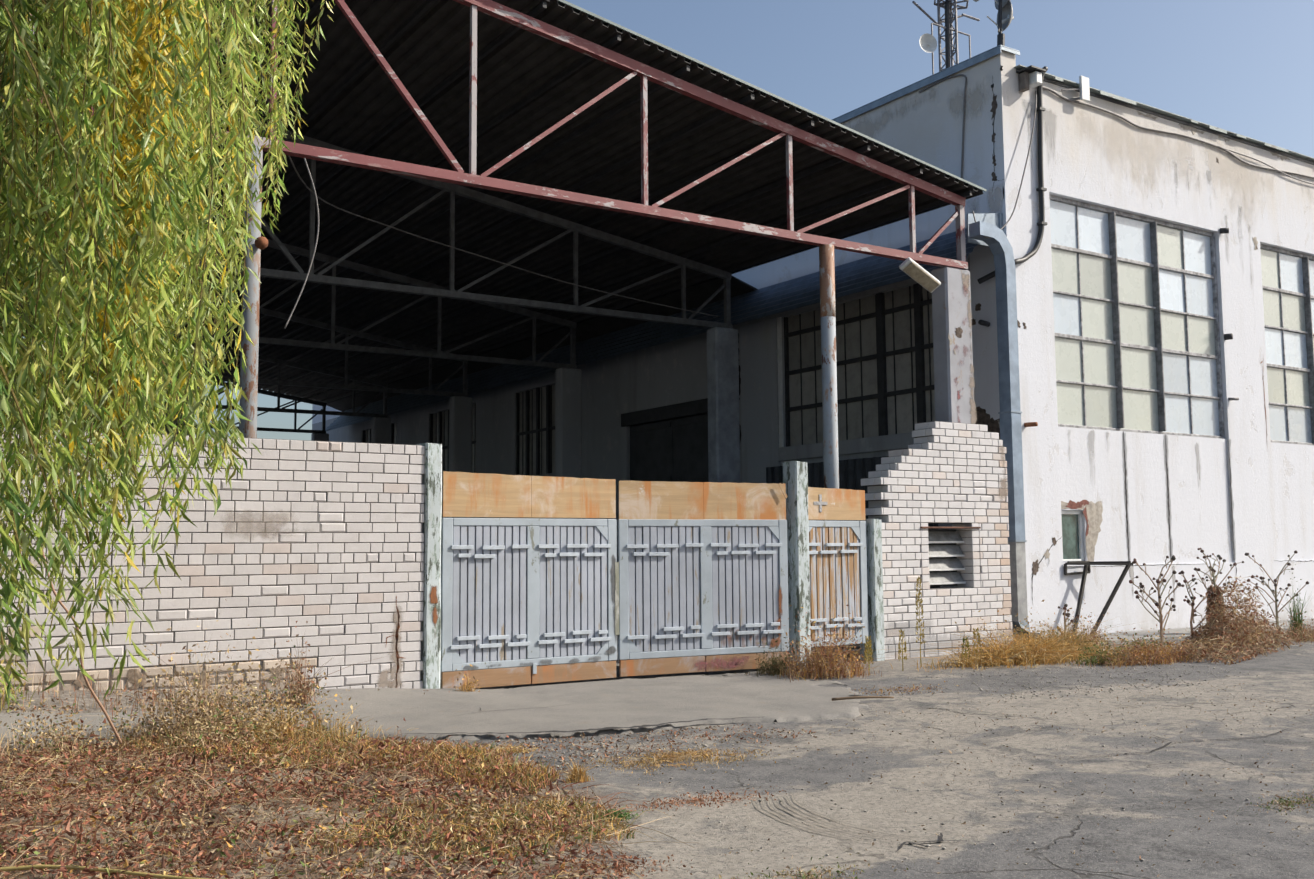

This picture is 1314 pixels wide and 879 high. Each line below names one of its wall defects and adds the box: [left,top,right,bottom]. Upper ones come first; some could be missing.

spalling [948,303,981,355]
spalling [1061,500,1103,562]
rust [430,586,438,625]